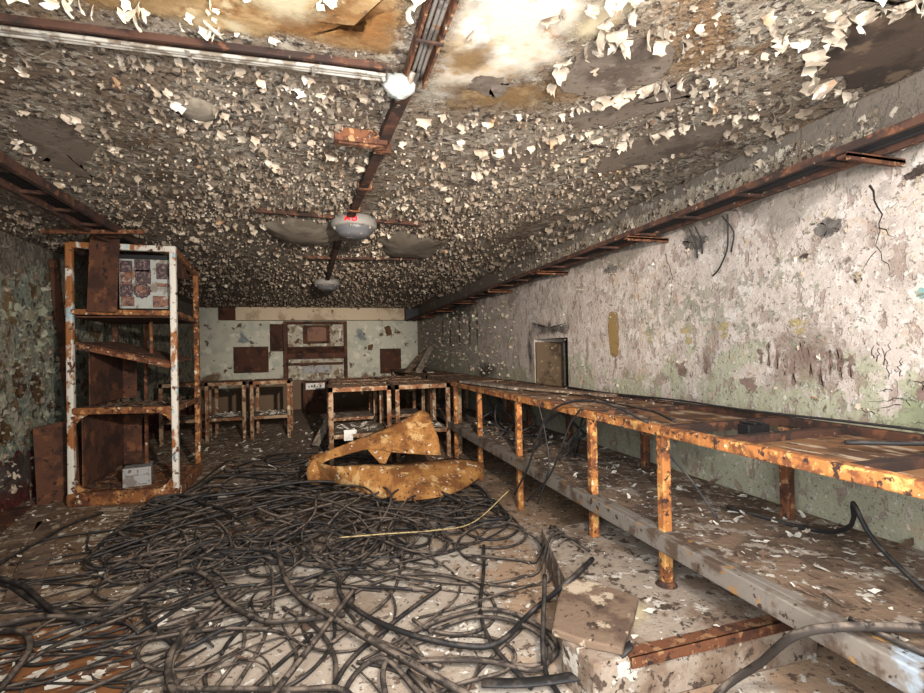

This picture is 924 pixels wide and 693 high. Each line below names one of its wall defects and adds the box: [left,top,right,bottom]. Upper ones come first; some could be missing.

corrosion [84,0,402,52]
water stain [434,0,632,108]
peeling [0,0,924,310]
peeling [0,256,62,500]
peeling [420,301,517,377]
peeling [577,251,820,394]
water stain [757,318,855,386]